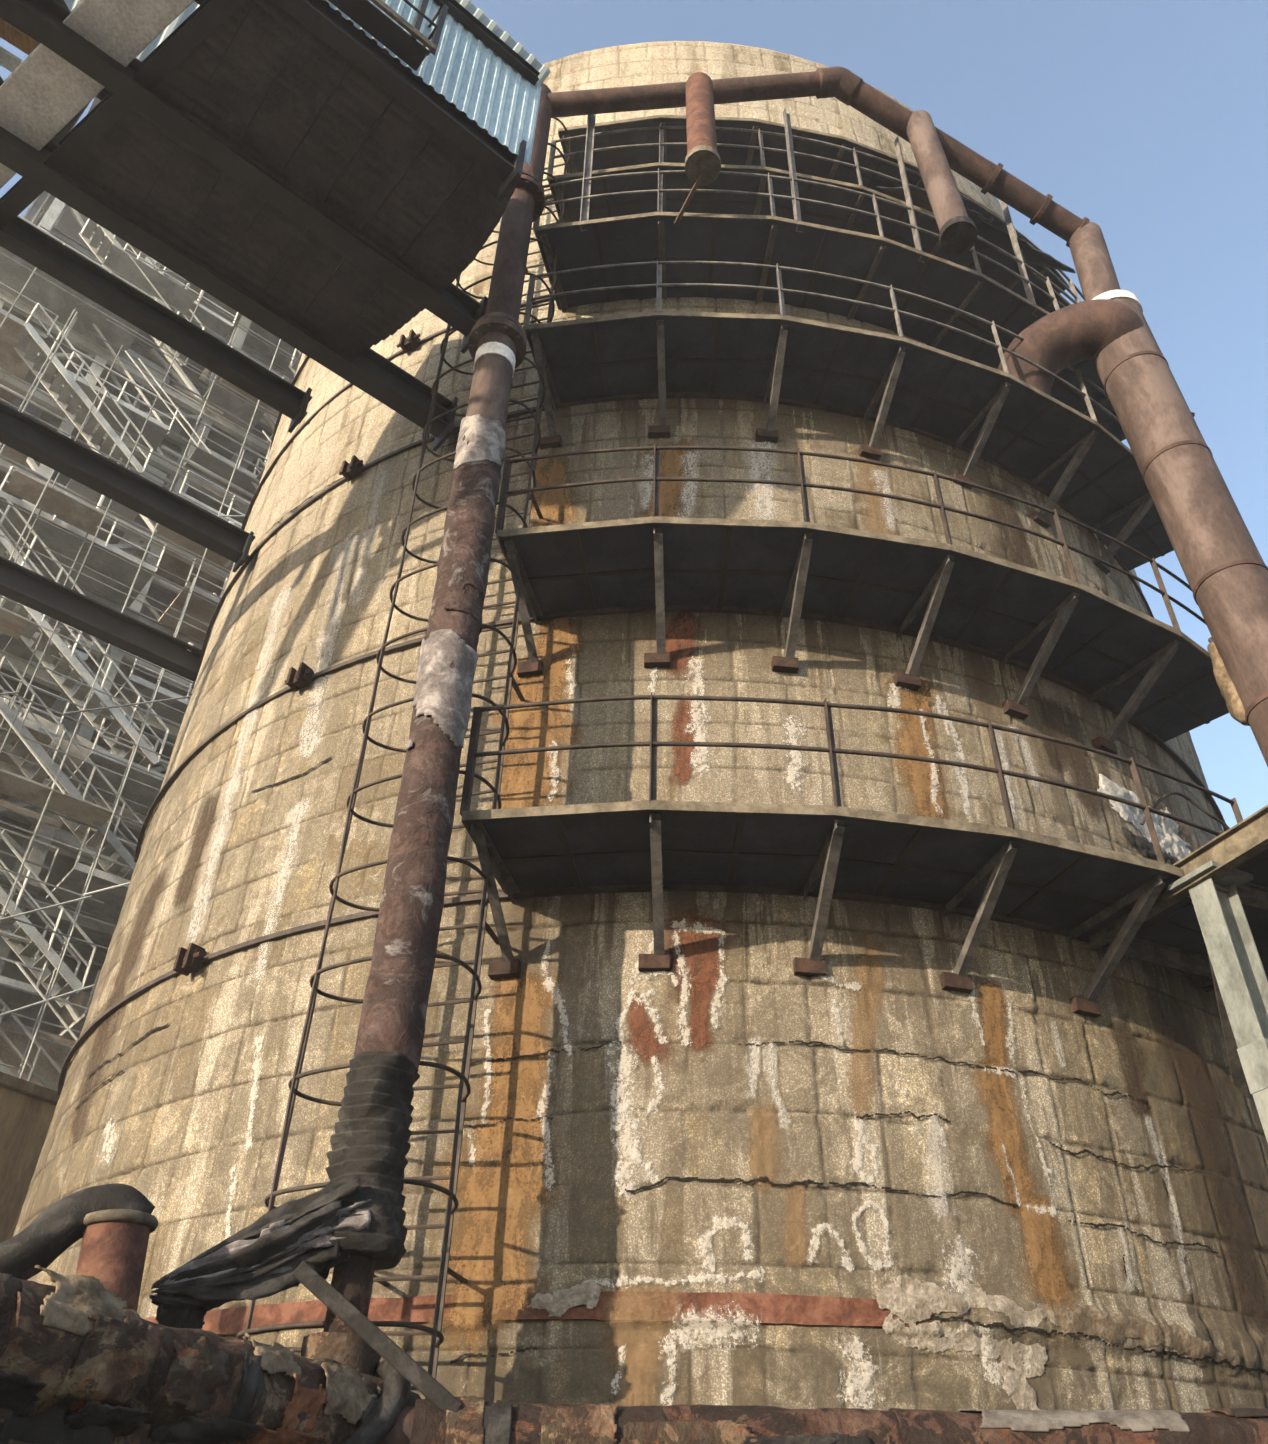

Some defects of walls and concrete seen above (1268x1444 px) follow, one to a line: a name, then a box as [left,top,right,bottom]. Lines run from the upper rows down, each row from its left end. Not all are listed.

rust [491,617,584,809]
spalling [1097,774,1191,863]
rust [665,910,726,1050]
water stain [607,918,729,1200]
crack [739,1040,1149,1103]
rust [430,970,559,1352]
peeling [526,1279,601,1317]
water stain [596,1216,765,1288]
crack [625,1176,1018,1207]
water stain [809,1116,892,1272]
peeling [876,1275,1243,1410]
crack [930,1316,1268,1375]